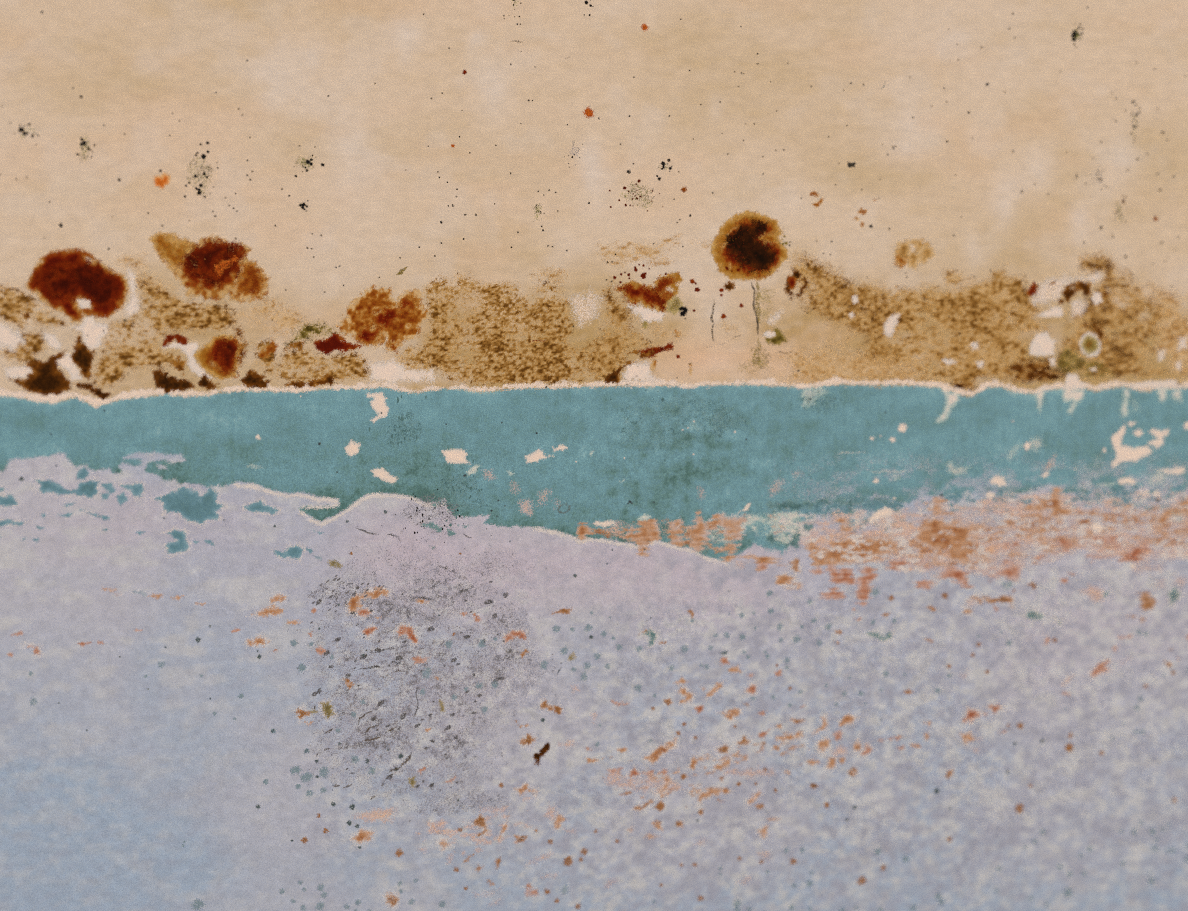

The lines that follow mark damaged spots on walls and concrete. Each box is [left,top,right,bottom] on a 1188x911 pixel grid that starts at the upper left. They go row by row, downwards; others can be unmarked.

water stain [0,282,83,367]
corrosion [8,247,130,400]
corrosion [149,231,271,304]
water stain [91,251,371,390]
corrosion [151,284,429,393]
water stain [394,233,710,391]
corrosion [710,209,810,301]
water stain [739,247,1188,415]
peeling [344,439,361,458]
peeling [0,464,448,559]
peeling [342,584,439,696]
peeling [438,421,1188,874]